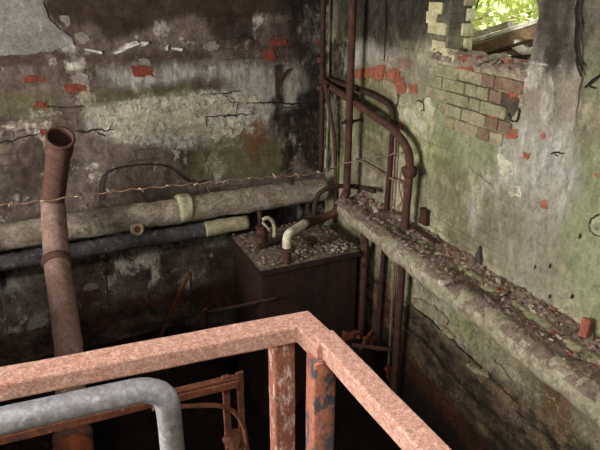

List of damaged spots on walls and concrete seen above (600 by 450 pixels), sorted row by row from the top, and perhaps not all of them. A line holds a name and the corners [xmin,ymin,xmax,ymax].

crack [0,132,42,146]
flaking render [61,71,86,93]
crack [72,125,114,136]
flaking render [0,32,211,85]
damp [85,65,319,150]
crack [200,91,319,126]
flaking render [354,51,526,197]
crack [402,301,519,405]